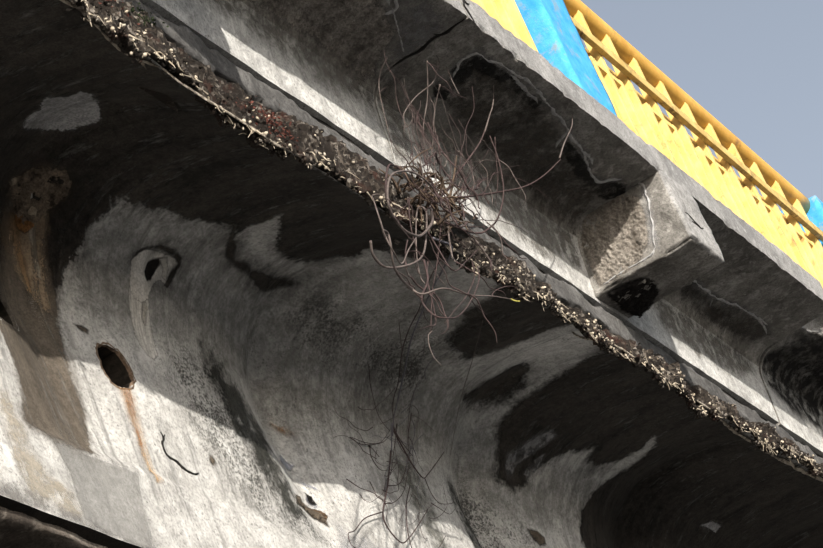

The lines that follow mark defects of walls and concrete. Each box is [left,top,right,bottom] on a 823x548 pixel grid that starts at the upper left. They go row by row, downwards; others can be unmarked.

crack [393,0,475,67]
peeling [24,91,101,131]
spalling [66,0,431,232]
spalling [8,165,72,233]
rust [5,213,51,311]
spalling [129,245,182,359]
leakage [446,284,593,360]
spalling [581,193,659,318]
spalling [427,217,823,478]
crack [160,432,199,475]
leakage [462,344,823,548]
leakage [448,482,529,548]